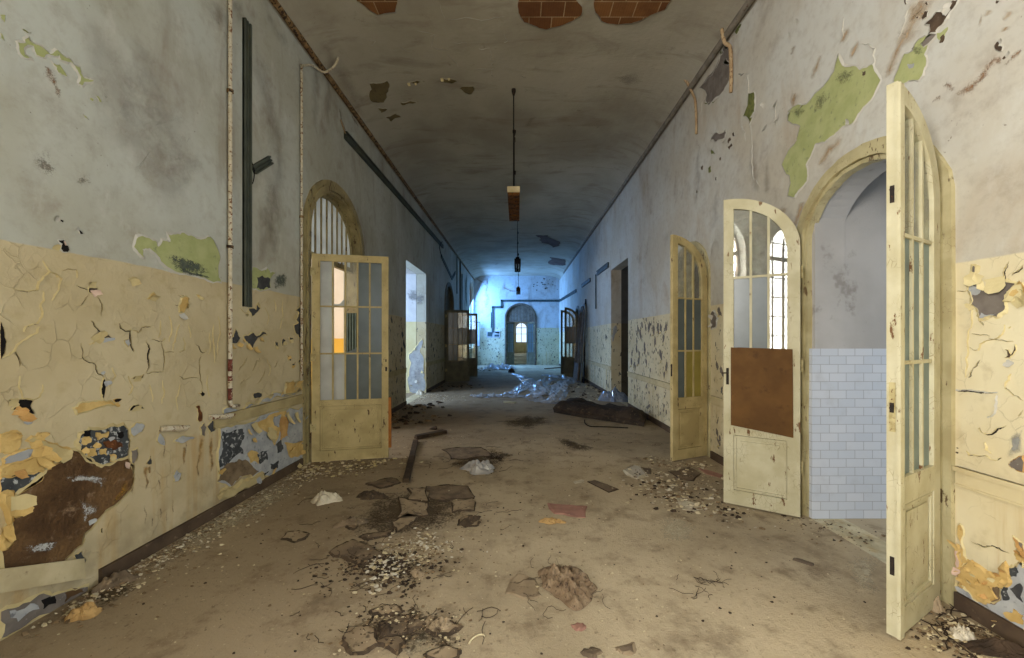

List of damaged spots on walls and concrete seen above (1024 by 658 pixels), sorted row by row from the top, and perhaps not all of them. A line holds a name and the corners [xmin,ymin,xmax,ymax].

peeling [0,14,102,103]
spalling [516,0,672,30]
peeling [699,23,743,106]
peeling [782,0,959,199]
crack [1,261,283,410]
peeling [132,231,222,284]
spalling [156,306,308,500]
peeling [630,318,668,417]
crack [955,267,1023,461]
peeling [963,264,1024,321]
spalling [0,371,152,569]
spalling [947,523,1024,630]